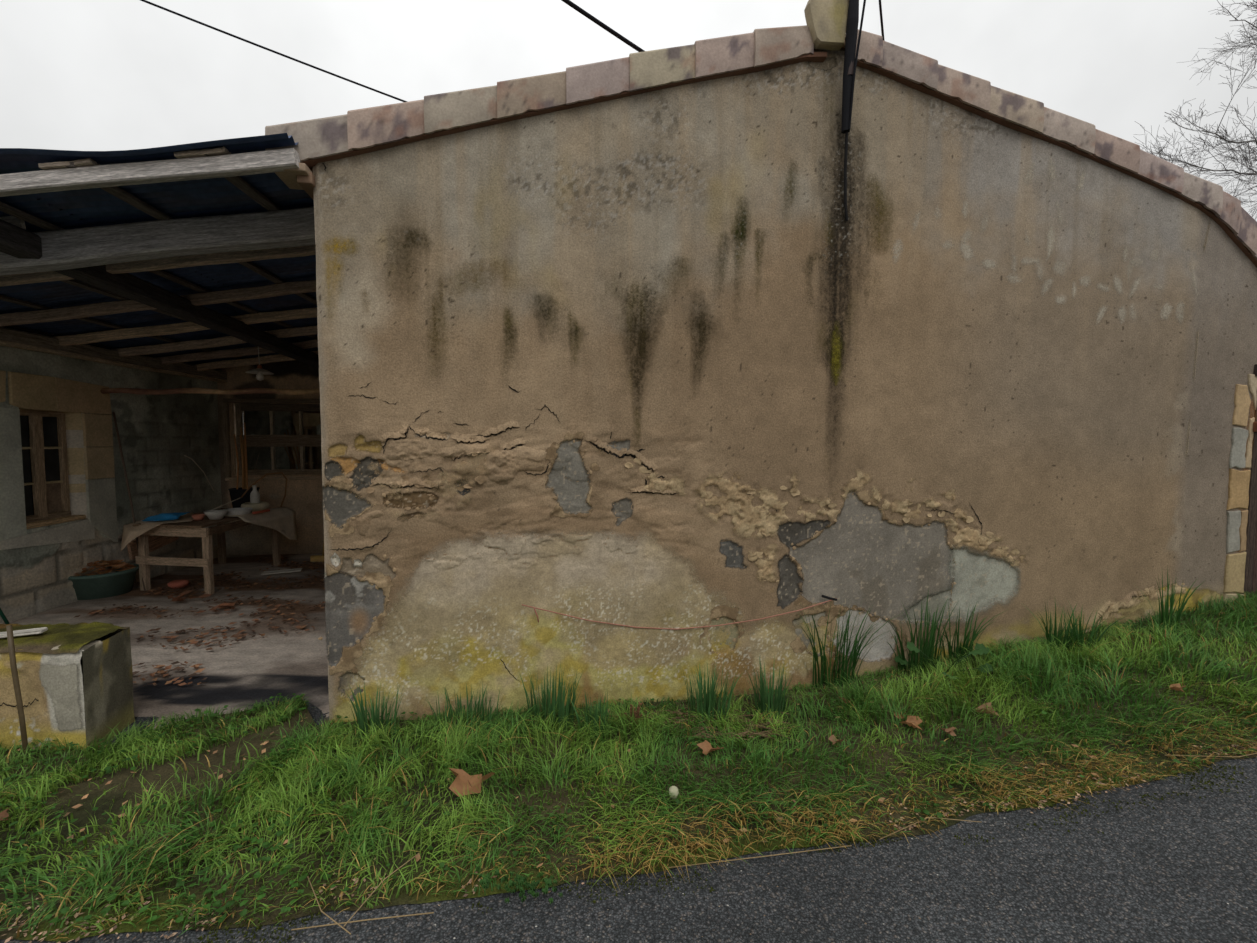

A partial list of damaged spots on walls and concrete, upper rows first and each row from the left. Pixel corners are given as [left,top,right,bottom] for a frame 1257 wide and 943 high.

damp [721,208,763,267]
damp [824,113,888,429]
damp [626,295,653,425]
damp [691,301,712,368]
flaking render [322,435,494,537]
crack [347,381,560,489]
flaking render [542,432,600,518]
crack [585,432,685,495]
flaking render [607,440,1025,662]
flaking render [318,553,396,702]
damp [333,531,839,723]